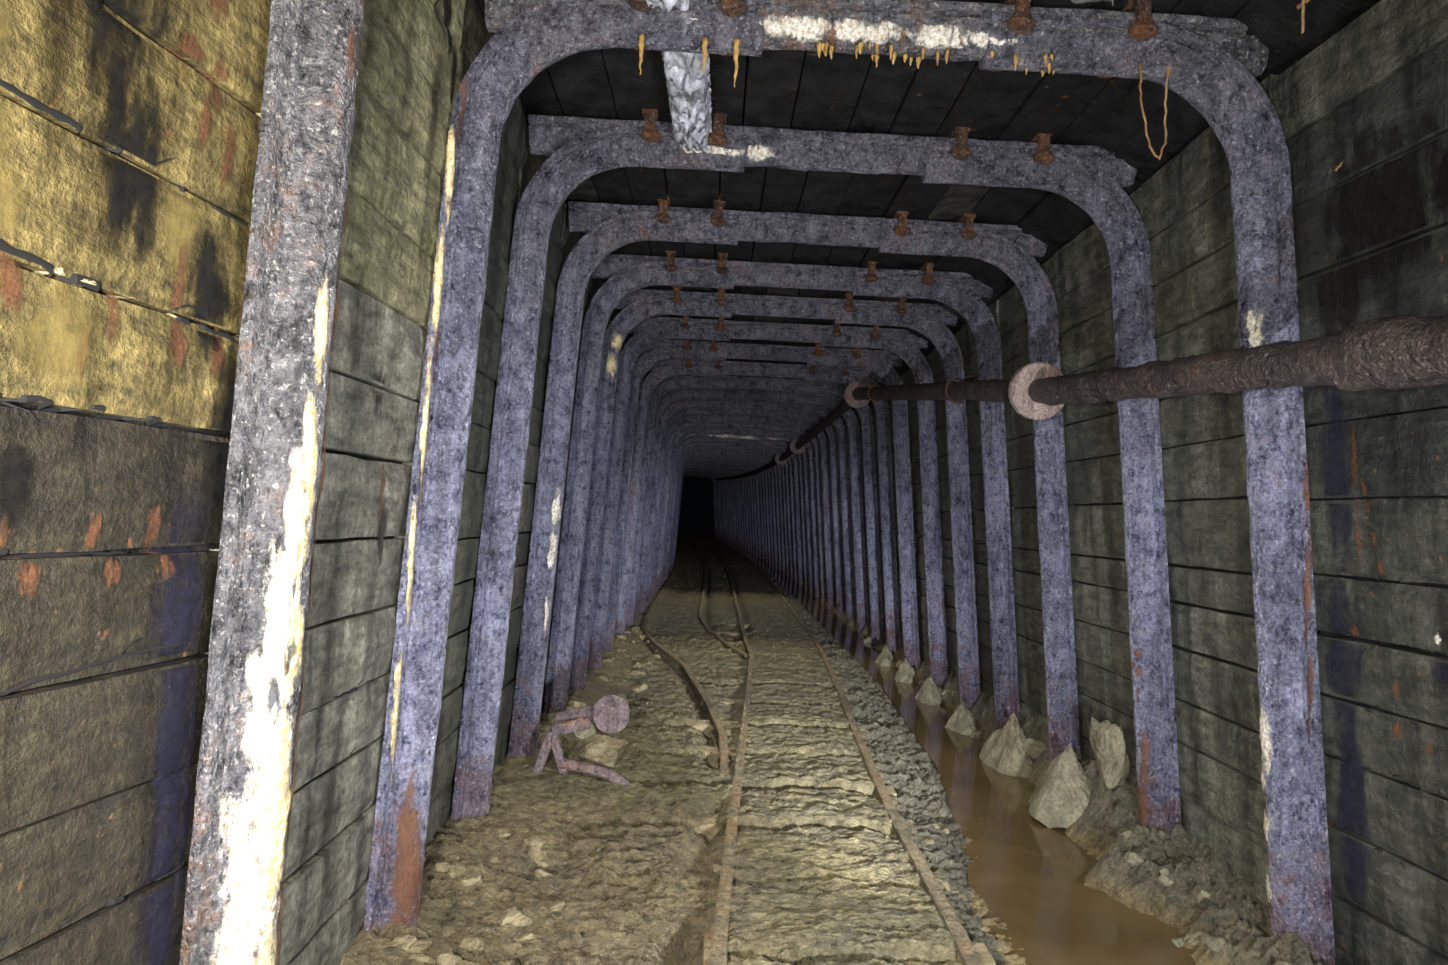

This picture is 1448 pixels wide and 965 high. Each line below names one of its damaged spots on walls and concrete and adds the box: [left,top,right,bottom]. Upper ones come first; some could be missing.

leakage [759,14,1017,49]
leakage [33,268,135,377]
leakage [84,0,235,965]
rust [391,777,424,926]